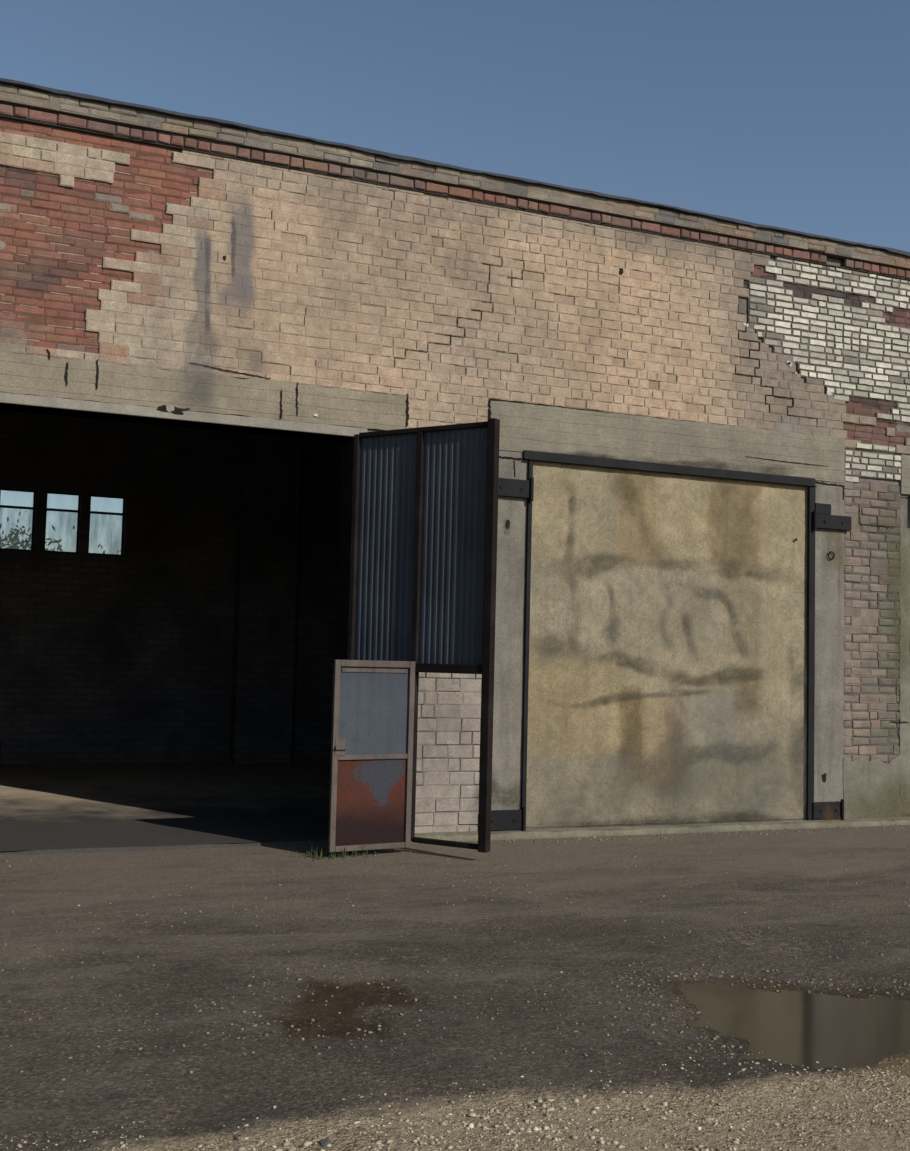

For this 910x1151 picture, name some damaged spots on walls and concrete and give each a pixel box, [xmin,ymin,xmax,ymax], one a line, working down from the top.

spalling [0,119,214,359]
damp [195,240,211,291]
crack [735,304,818,427]
peeling [743,257,910,482]